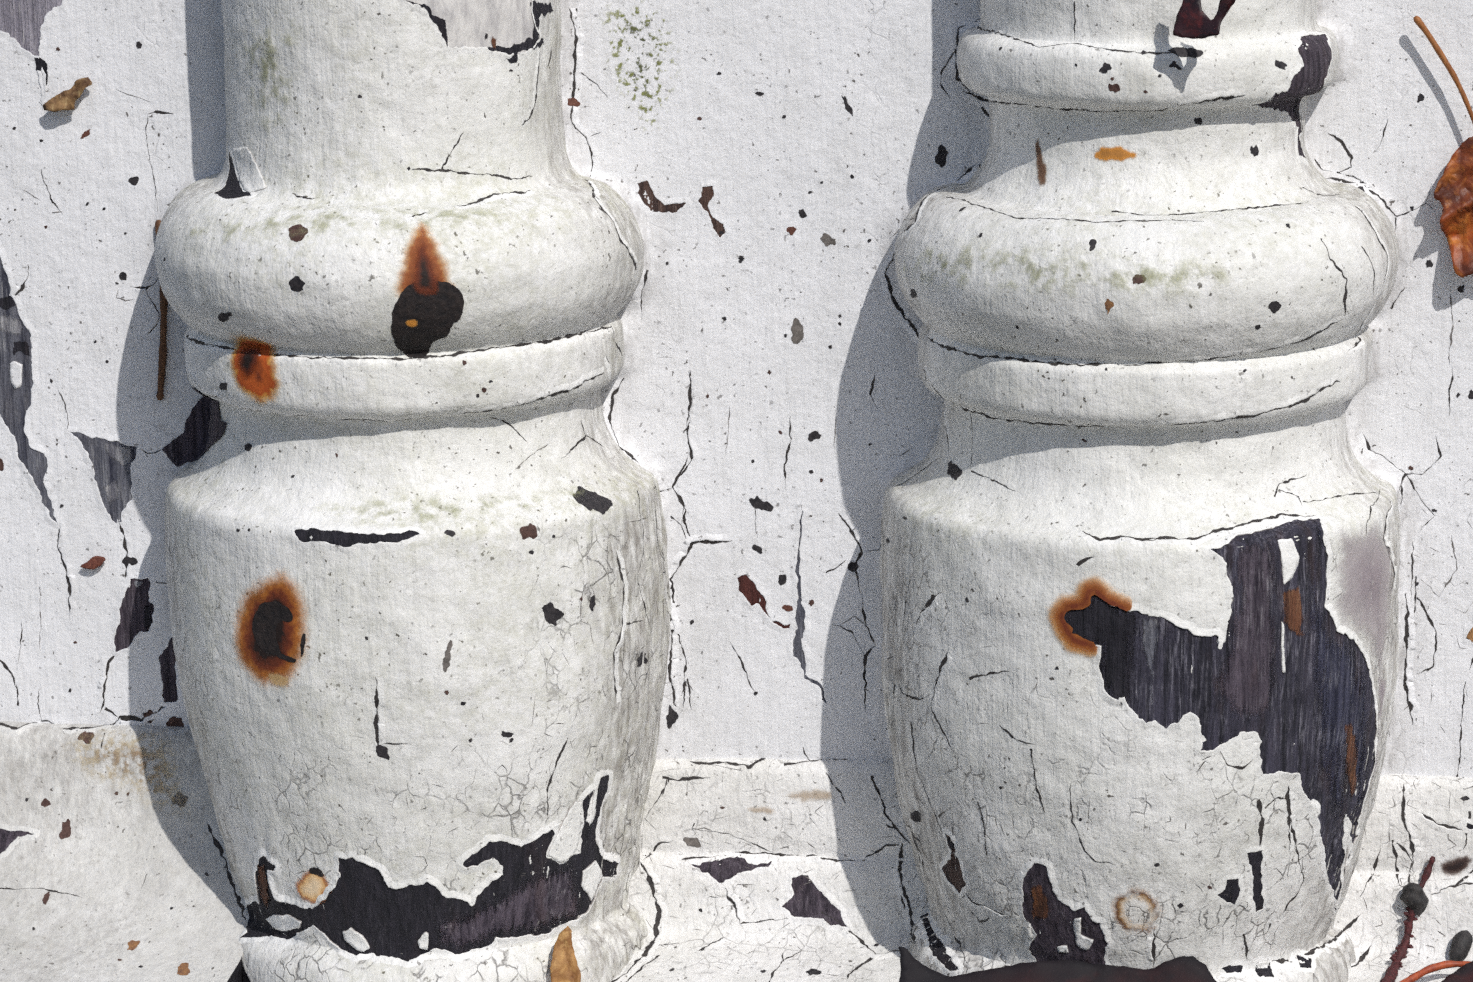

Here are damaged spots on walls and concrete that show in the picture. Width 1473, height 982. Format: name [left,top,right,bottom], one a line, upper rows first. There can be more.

corrosion [391,225,464,358]
peeling [0,240,64,530]
corrosion [231,337,278,402]
crack [182,8,758,719]
crack [869,373,879,410]
corrosion [236,577,306,686]
corrosion [1050,578,1132,655]
crack [207,423,1473,982]
peeling [1064,515,1390,918]
peeling [239,769,621,968]
peeling [683,837,853,933]
peeling [1016,857,1114,965]